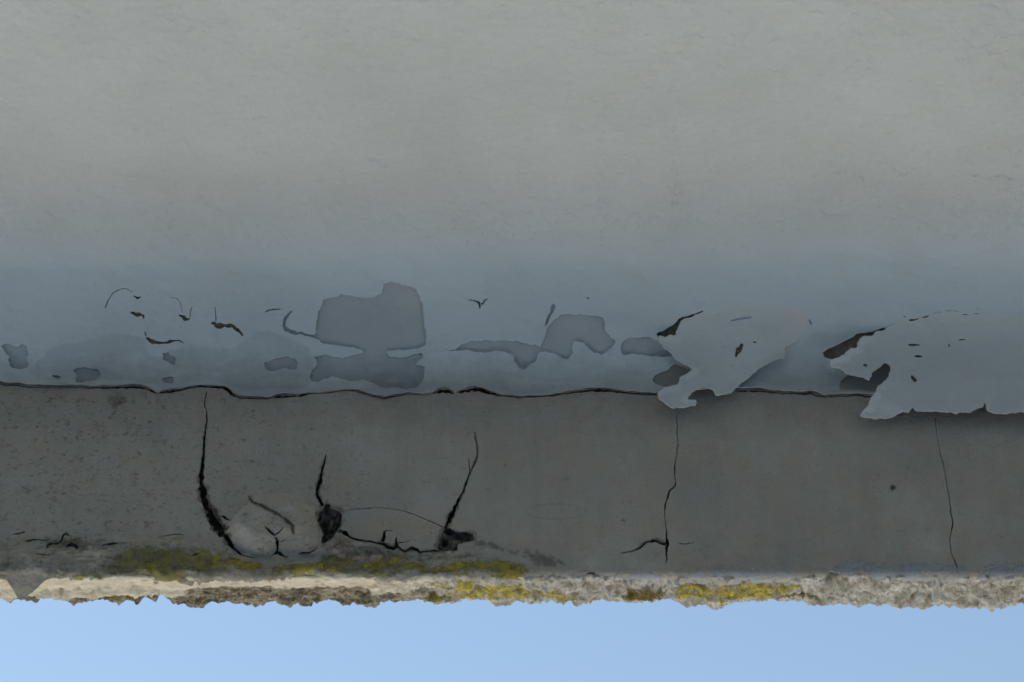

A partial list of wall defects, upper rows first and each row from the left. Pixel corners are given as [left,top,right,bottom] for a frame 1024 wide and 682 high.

peeling [2,344,29,369]
peeling [282,281,427,389]
peeling [446,302,811,409]
peeling [823,310,1024,420]
crack [166,394,316,557]
crack [316,438,478,553]
crack [629,417,694,562]